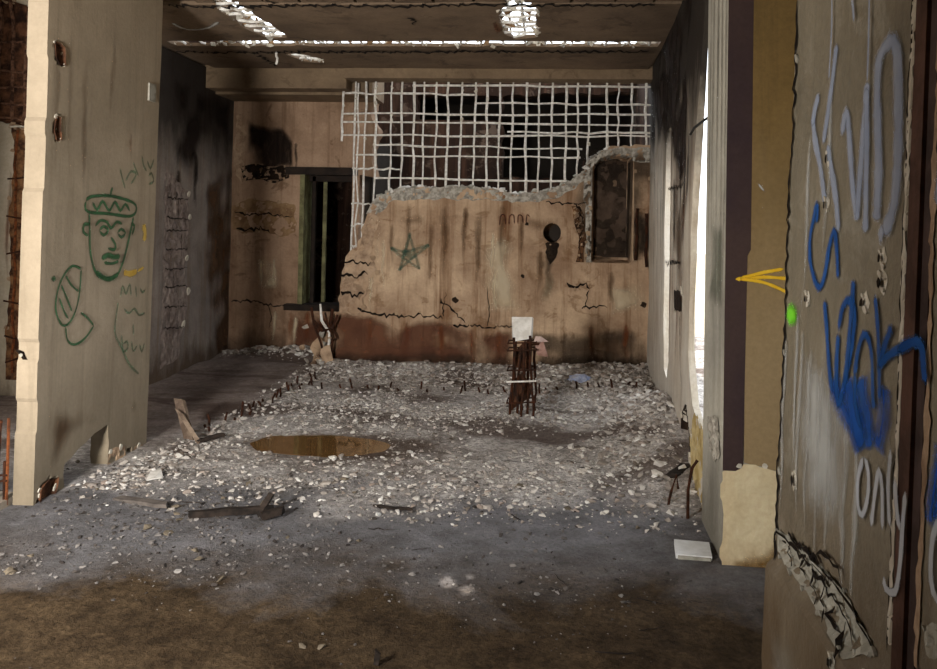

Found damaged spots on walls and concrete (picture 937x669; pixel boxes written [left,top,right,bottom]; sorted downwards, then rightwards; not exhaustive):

spalling [0,0,28,380]
leakage [177,87,229,162]
leakage [208,180,231,354]
leakage [249,125,292,170]
spalling [339,81,651,316]
crack [773,0,937,669]